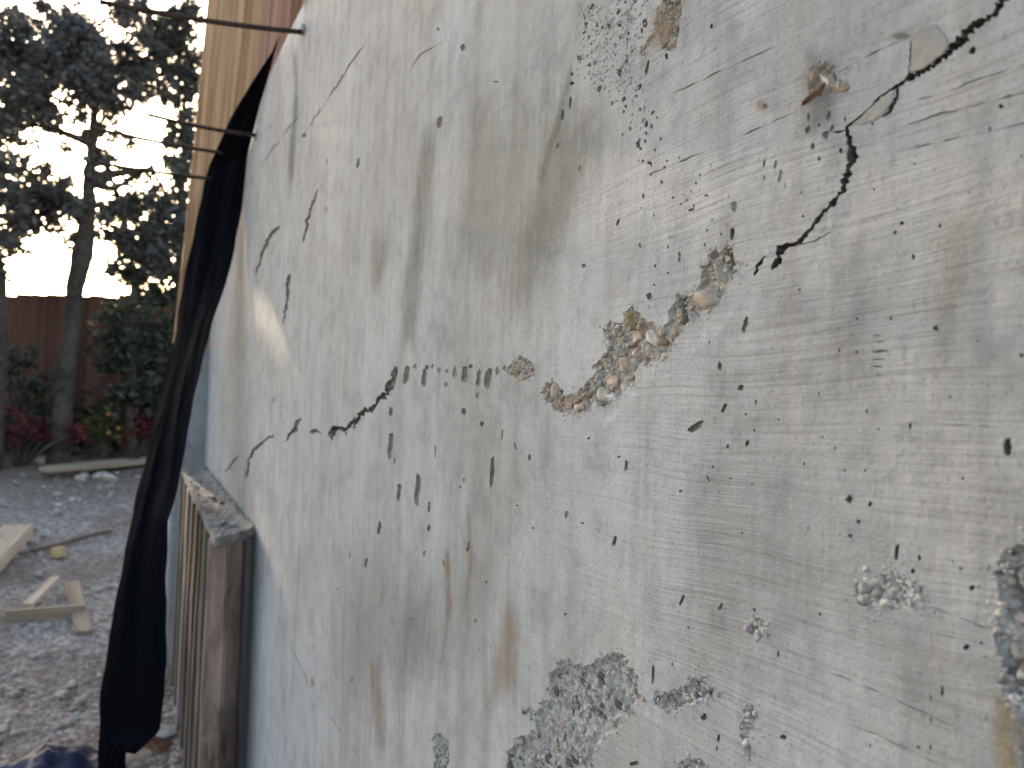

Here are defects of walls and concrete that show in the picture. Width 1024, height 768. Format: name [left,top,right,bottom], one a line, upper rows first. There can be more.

peeling [577,0,680,184]
crack [753,0,1009,276]
crack [224,369,397,478]
spalling [842,557,935,624]
spalling [972,526,1024,768]